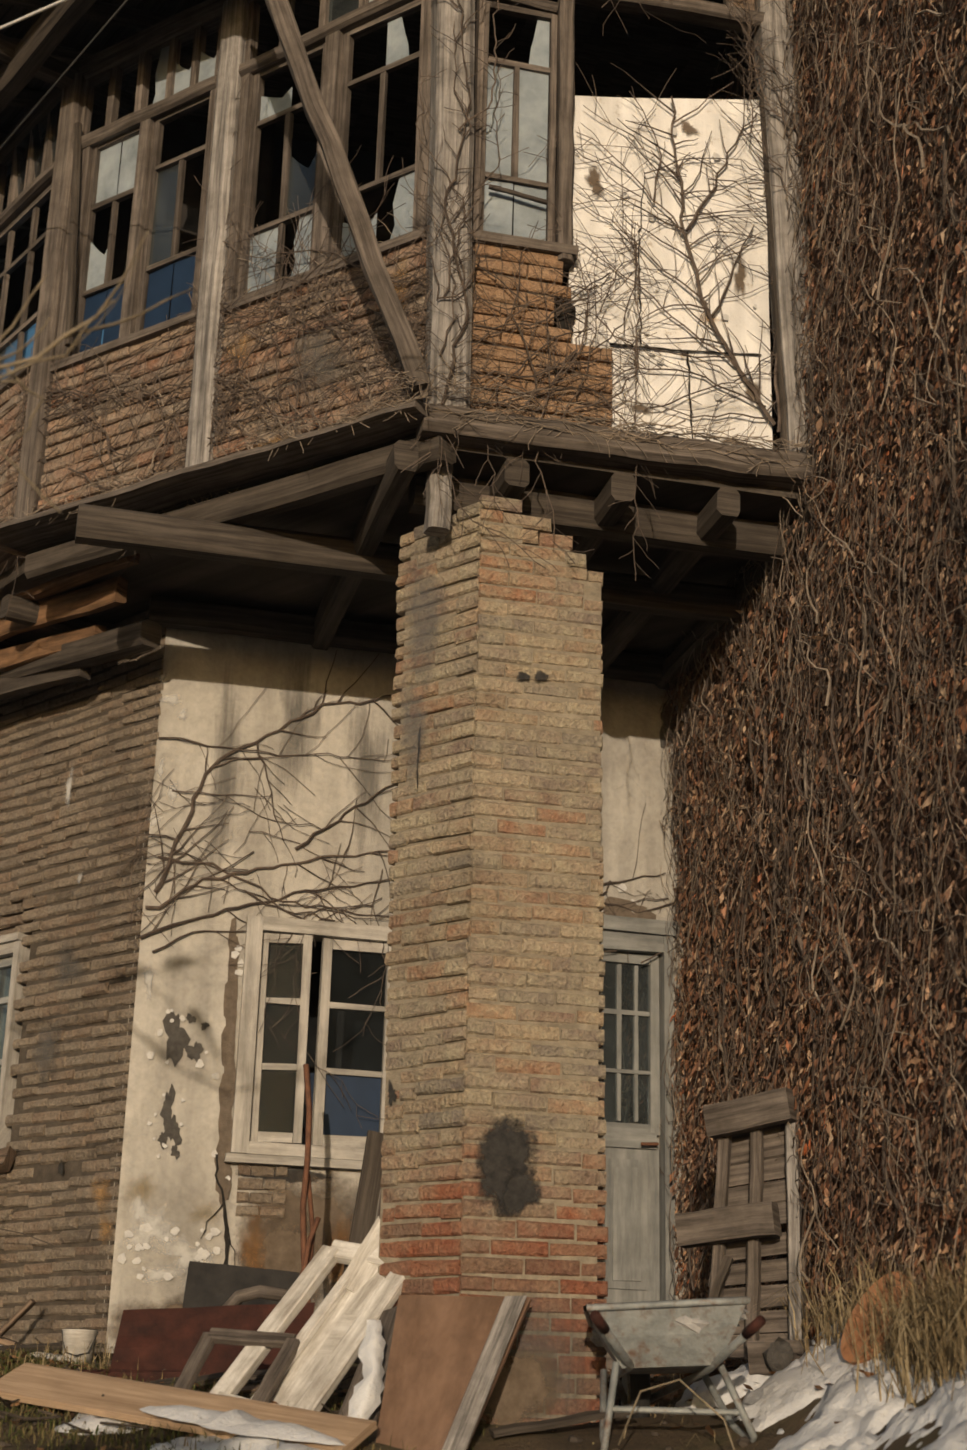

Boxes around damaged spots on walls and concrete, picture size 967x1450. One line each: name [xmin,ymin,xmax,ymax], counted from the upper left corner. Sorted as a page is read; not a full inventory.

spalling [147,917,331,1218]
flaking render [117,1194,221,1281]